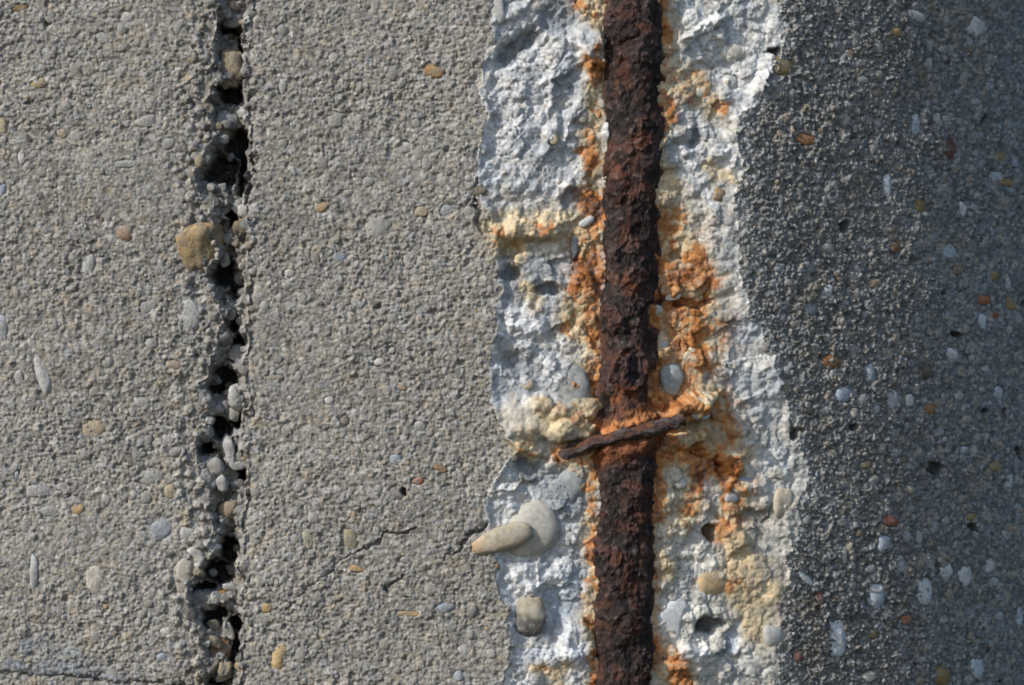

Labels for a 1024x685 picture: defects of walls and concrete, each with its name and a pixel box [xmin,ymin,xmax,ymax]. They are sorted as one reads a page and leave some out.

crack [0,0,260,685]
spalling [472,0,609,685]
spalling [647,0,811,685]